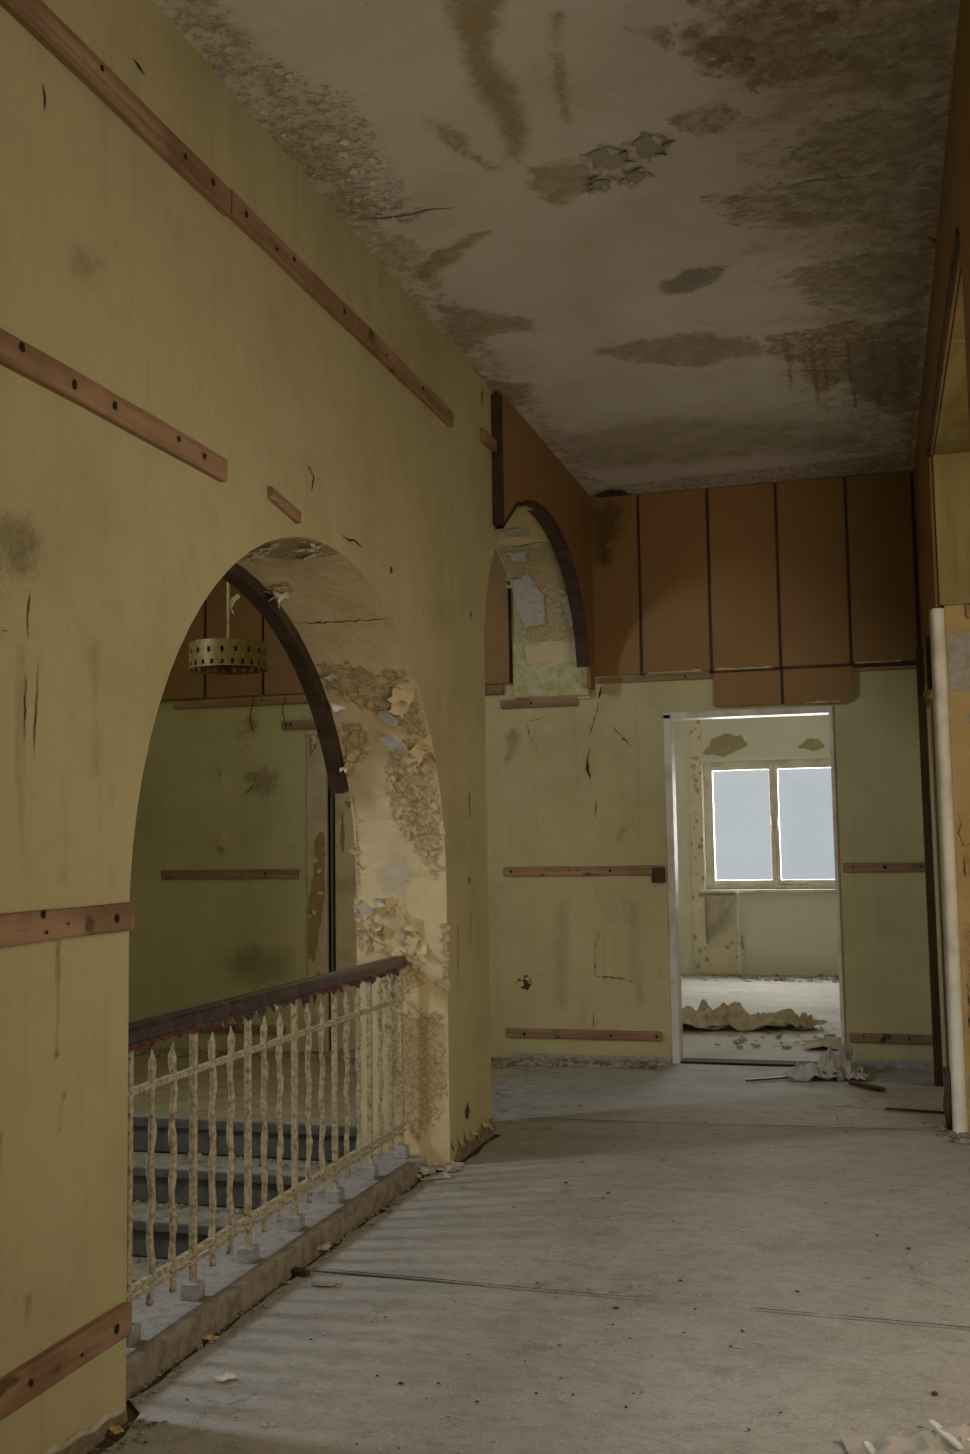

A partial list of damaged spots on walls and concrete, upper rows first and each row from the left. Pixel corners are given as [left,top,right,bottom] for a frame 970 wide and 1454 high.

leakage [456,0,523,153]
spalling [579,131,676,195]
leakage [663,267,722,293]
leakage [701,95,946,315]
spalling [501,527,587,697]
spalling [947,631,970,692]
crack [585,687,632,817]
peeling [218,662,451,1142]
peeling [959,885,970,1036]